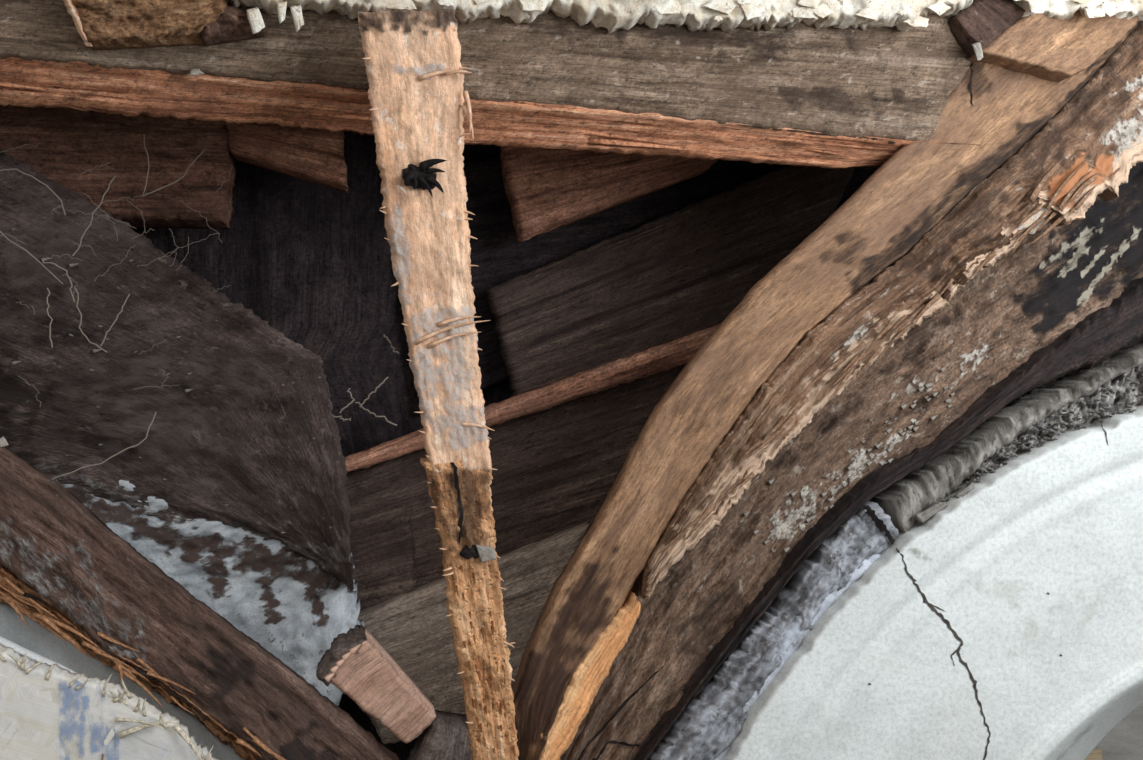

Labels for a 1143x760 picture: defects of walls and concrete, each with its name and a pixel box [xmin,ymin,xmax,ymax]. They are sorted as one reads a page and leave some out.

crack [839,505,991,760]